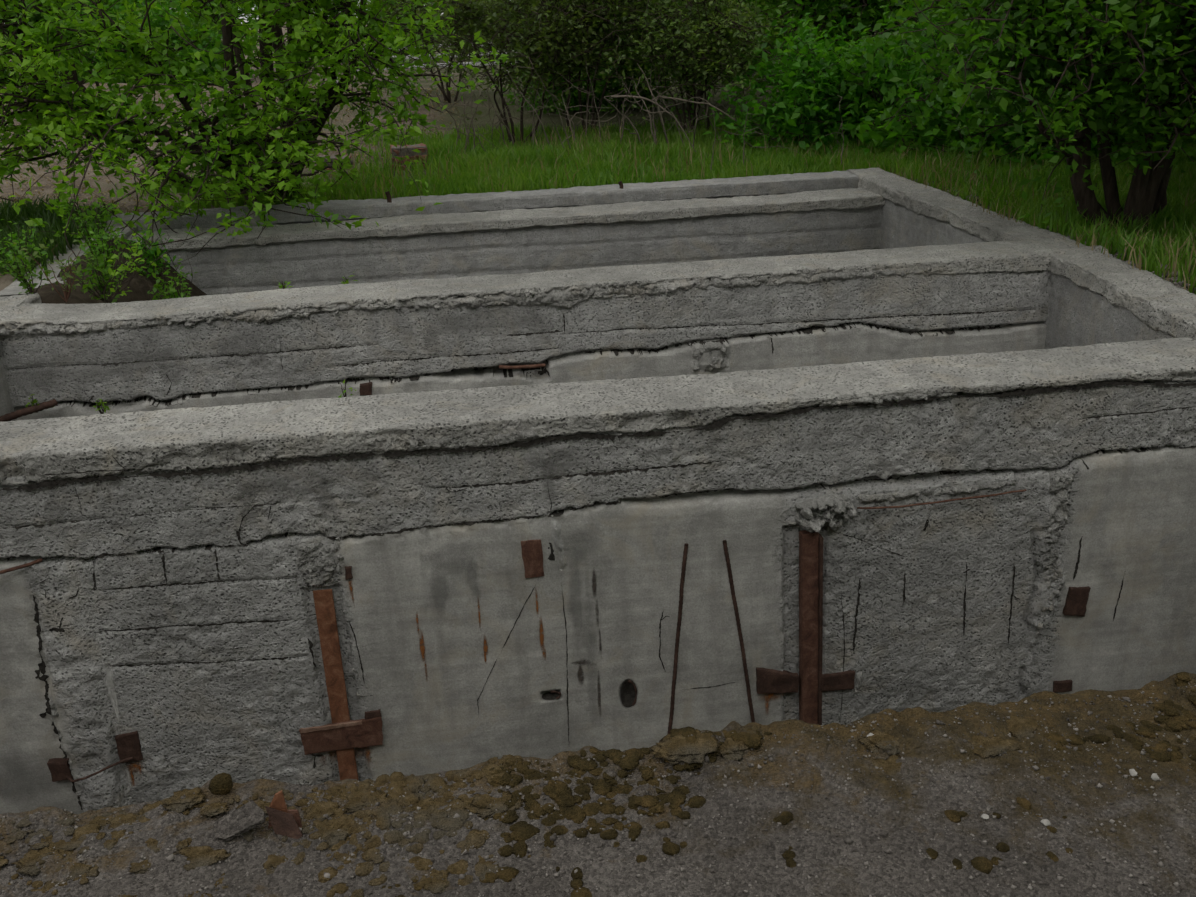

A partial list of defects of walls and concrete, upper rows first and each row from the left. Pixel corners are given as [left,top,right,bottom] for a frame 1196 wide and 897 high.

crack [15,309,1033,407]
corrosion [416,614,427,679]
corrosion [536,594,546,657]
crack [0,381,1196,810]
spalling [1033,468,1076,636]